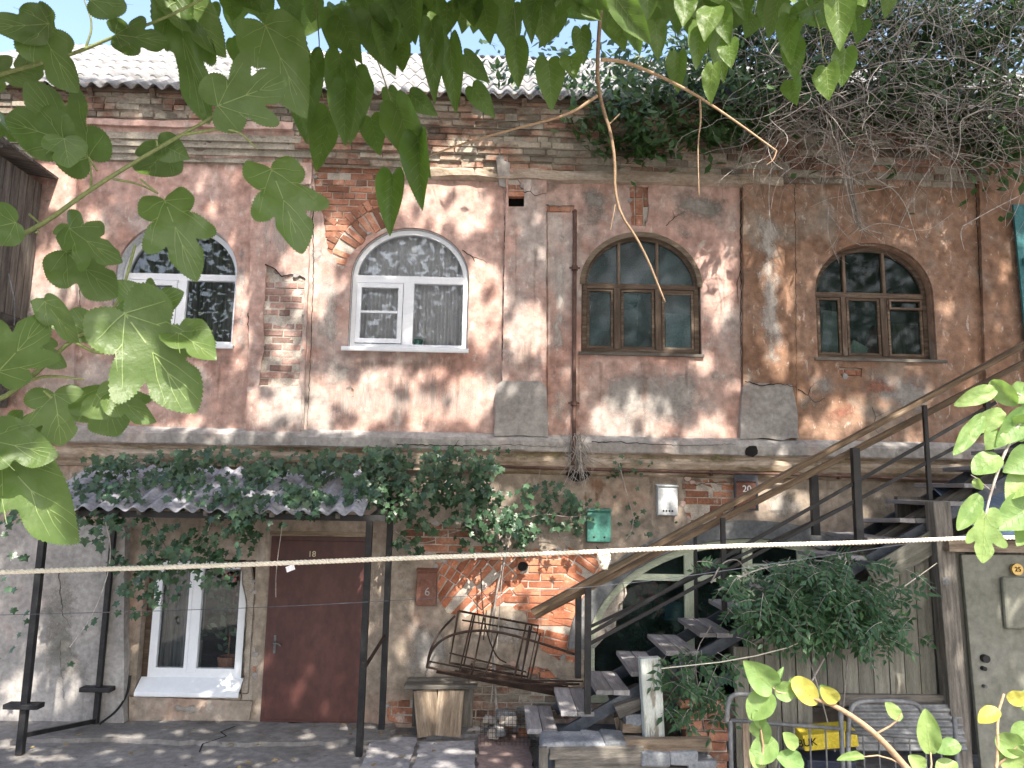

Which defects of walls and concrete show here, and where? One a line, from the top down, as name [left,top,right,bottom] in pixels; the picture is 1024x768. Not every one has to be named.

flaking render [303,167,393,269]
flaking render [627,185,648,226]
flaking render [259,267,306,387]
crack [737,184,825,405]
flaking render [680,477,734,521]
flaking render [399,521,627,723]